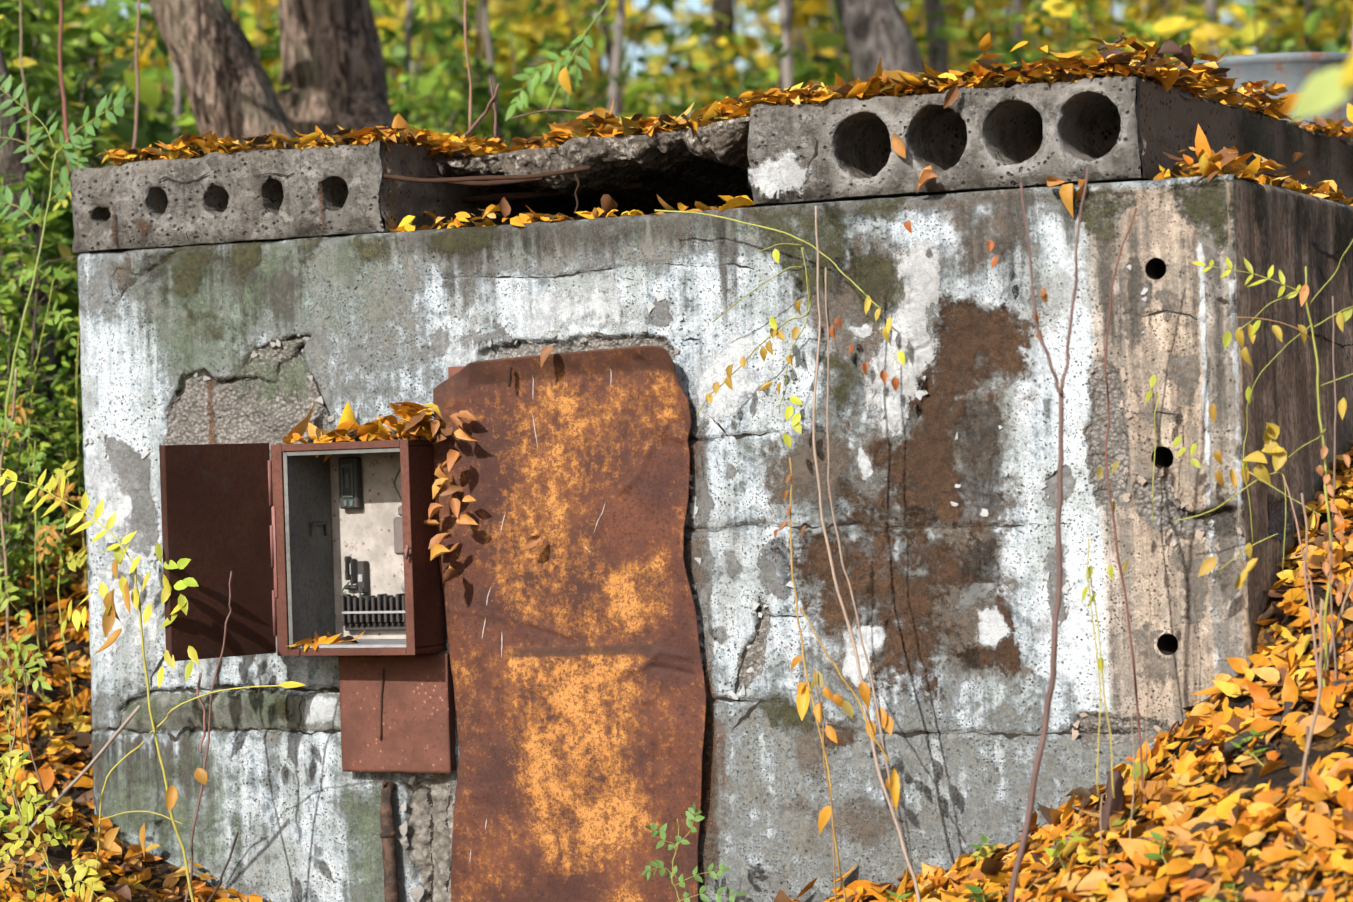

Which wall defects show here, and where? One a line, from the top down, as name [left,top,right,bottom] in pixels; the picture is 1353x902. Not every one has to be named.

leakage [1095,228,1151,344]
leakage [1287,199,1328,343]
peeling [83,432,160,568]
spalling [163,334,335,451]
corrosion [689,443,699,499]
corrosion [684,528,709,589]
leakage [1181,239,1243,573]
corrosion [699,665,726,834]
crack [714,697,784,731]
spalling [396,770,454,902]